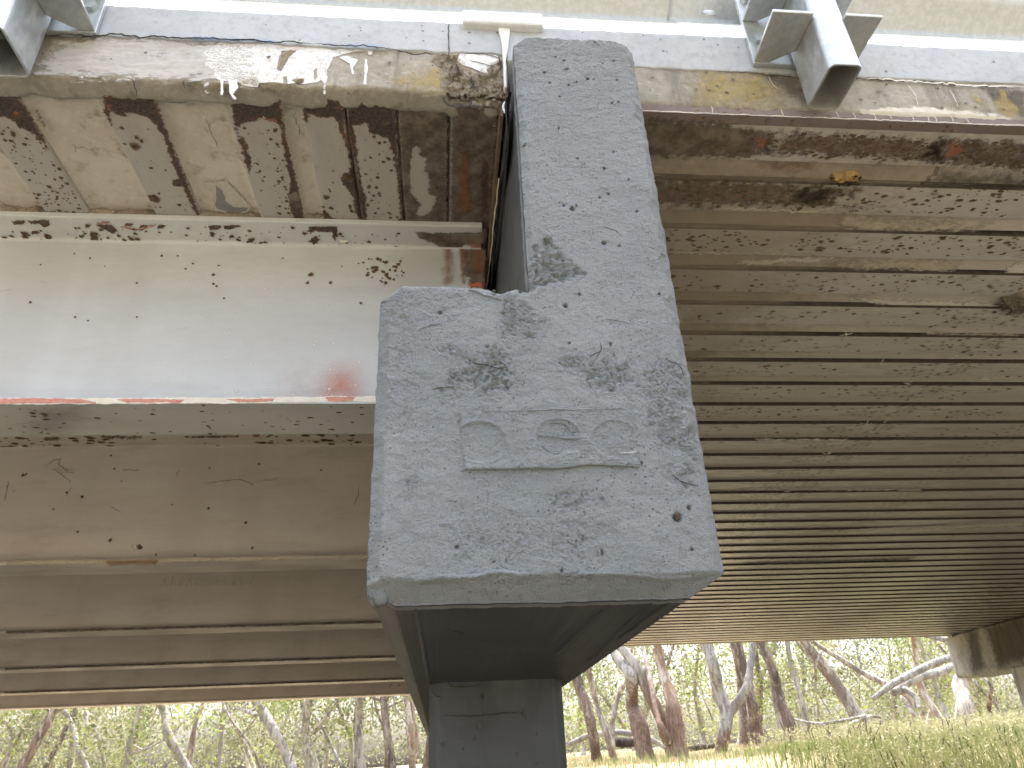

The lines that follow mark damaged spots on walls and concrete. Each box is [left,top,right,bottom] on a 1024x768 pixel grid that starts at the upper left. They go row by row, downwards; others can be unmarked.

spalling [432,54,508,100]
peeling [33,36,450,222]
rust [644,118,1024,173]
rust [0,127,81,240]
rust [68,223,172,241]
rust [185,127,405,284]
rust [655,176,891,213]
rust [903,187,1023,217]